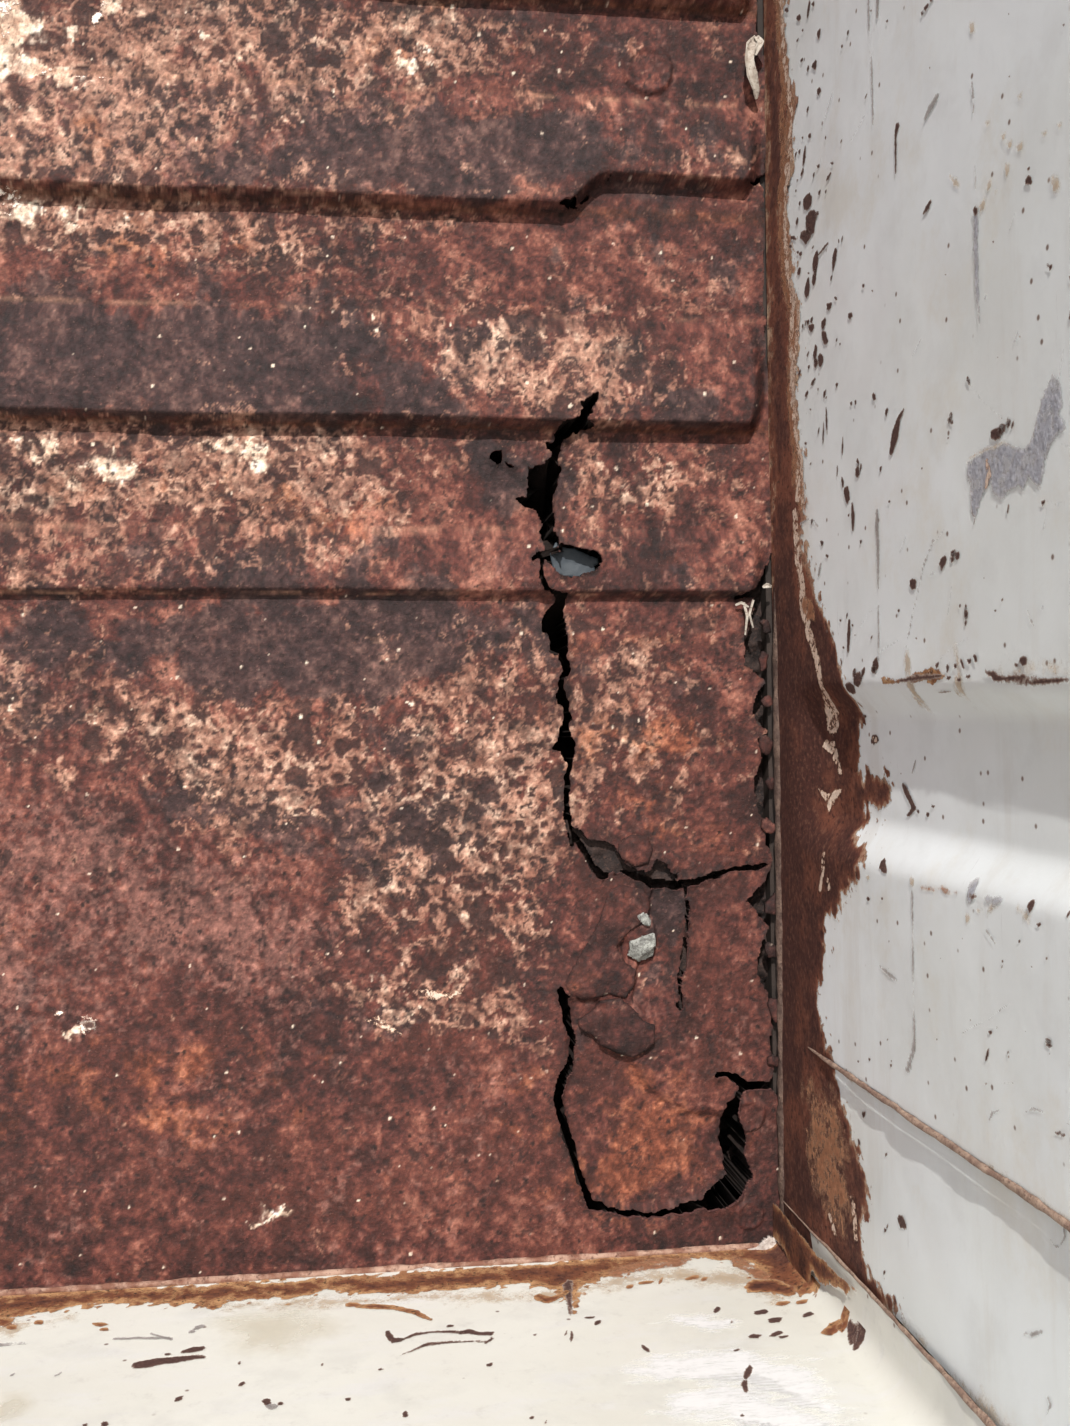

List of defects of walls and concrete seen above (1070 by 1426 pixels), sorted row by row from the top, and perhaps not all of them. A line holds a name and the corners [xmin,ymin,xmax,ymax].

corrosion [973,201,985,321]
peeling [967,376,1066,525]
corrosion [0,0,904,1333]
crack [515,391,768,1011]
corrosion [882,654,1069,704]
crack [553,986,771,1219]
corrosion [821,1305,866,1351]